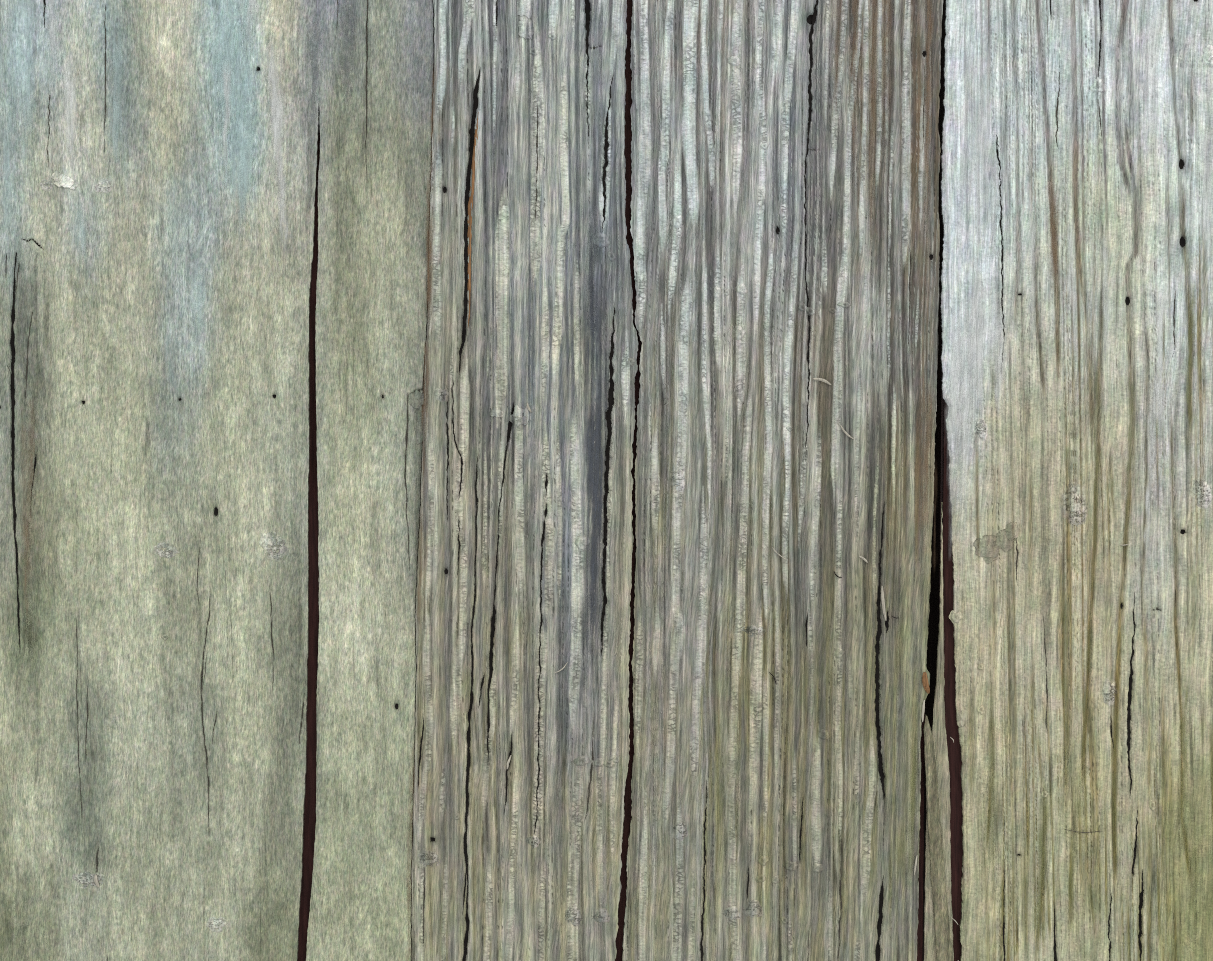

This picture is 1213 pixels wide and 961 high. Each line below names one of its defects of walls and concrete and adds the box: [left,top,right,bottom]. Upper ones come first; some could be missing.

crack [8,239,43,646]
crack [404,70,548,961]
crack [804,0,818,461]
crack [1108,593,1159,961]